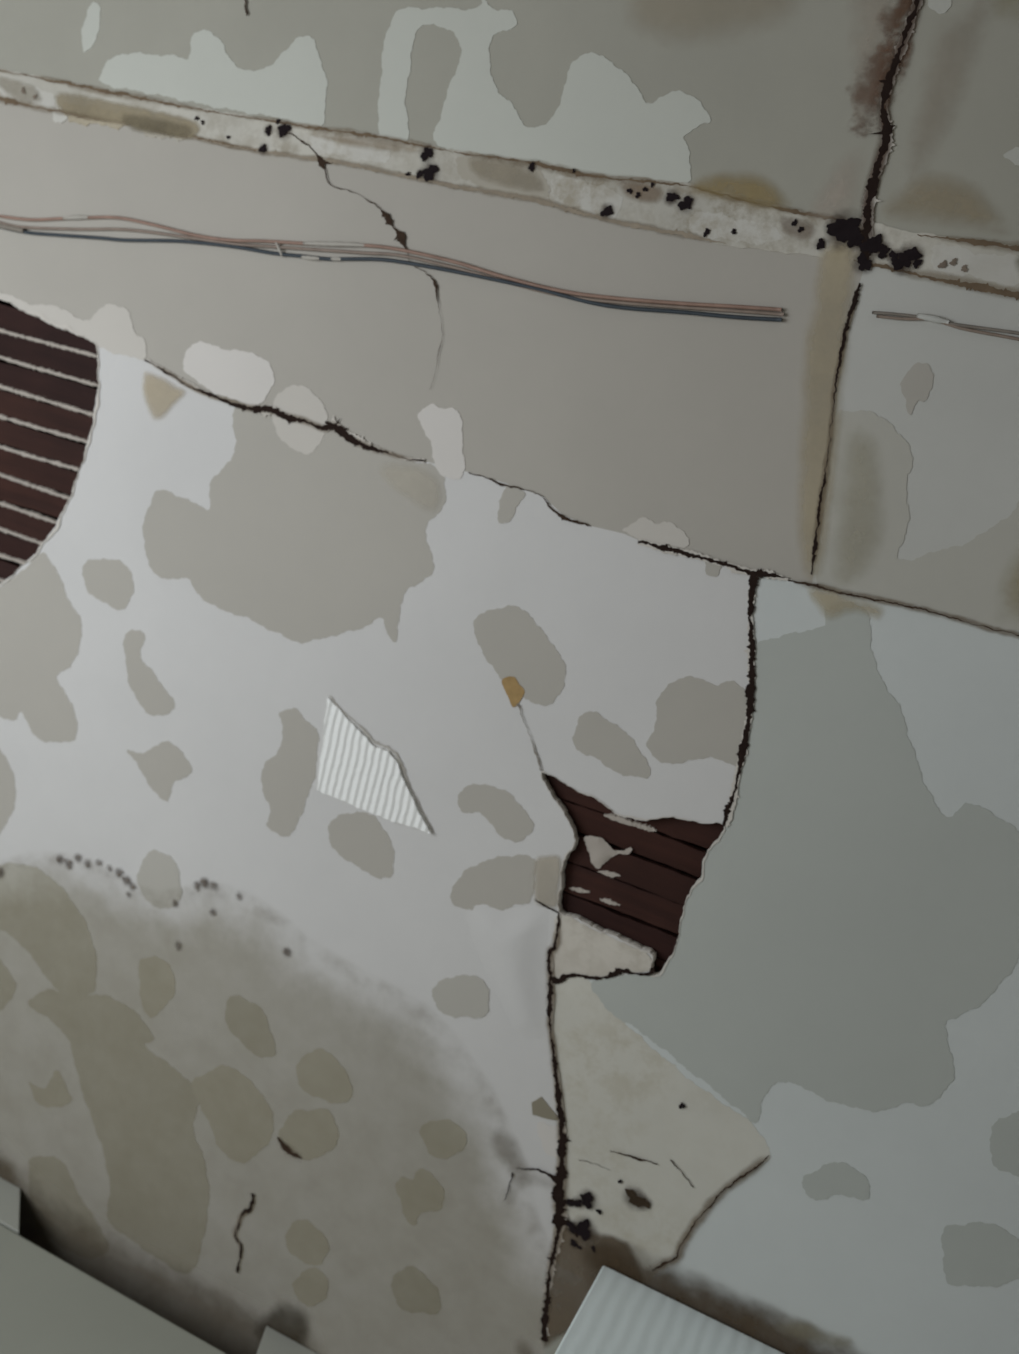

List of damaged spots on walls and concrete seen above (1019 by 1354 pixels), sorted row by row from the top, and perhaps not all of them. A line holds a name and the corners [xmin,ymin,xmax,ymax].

crack [287,133,443,390]
crack [145,359,425,463]
crack [638,0,1019,827]
peeling [900,362,934,415]
flaking render [0,297,100,743]
crack [468,472,589,526]
water stain [57,856,134,896]
peeling [540,410,1019,1272]
crack [503,899,769,1342]
crack [234,1193,255,1273]
peeling [941,1222,1019,1288]
water stain [262,1311,303,1343]